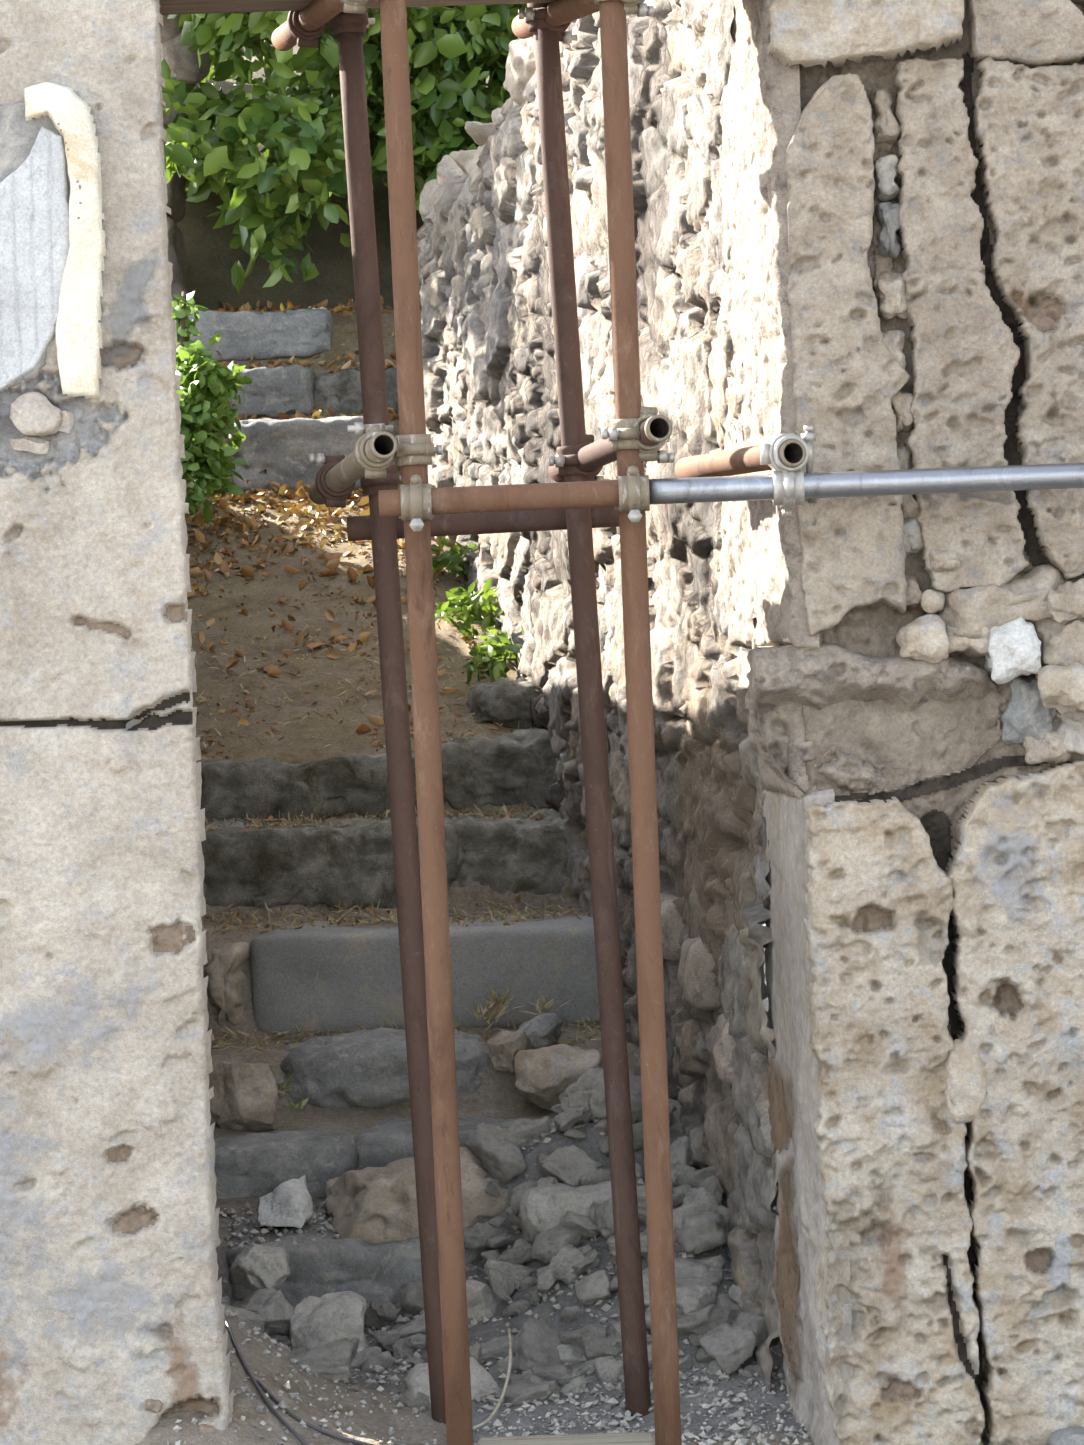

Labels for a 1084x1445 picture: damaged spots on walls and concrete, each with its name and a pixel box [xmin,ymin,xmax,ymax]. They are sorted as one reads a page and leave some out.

flaking render [0,82,143,479]
crack [961,52,1049,567]
crack [0,692,193,731]
crack [834,755,1047,872]
crack [942,911,964,1041]
crack [943,1135,986,1418]